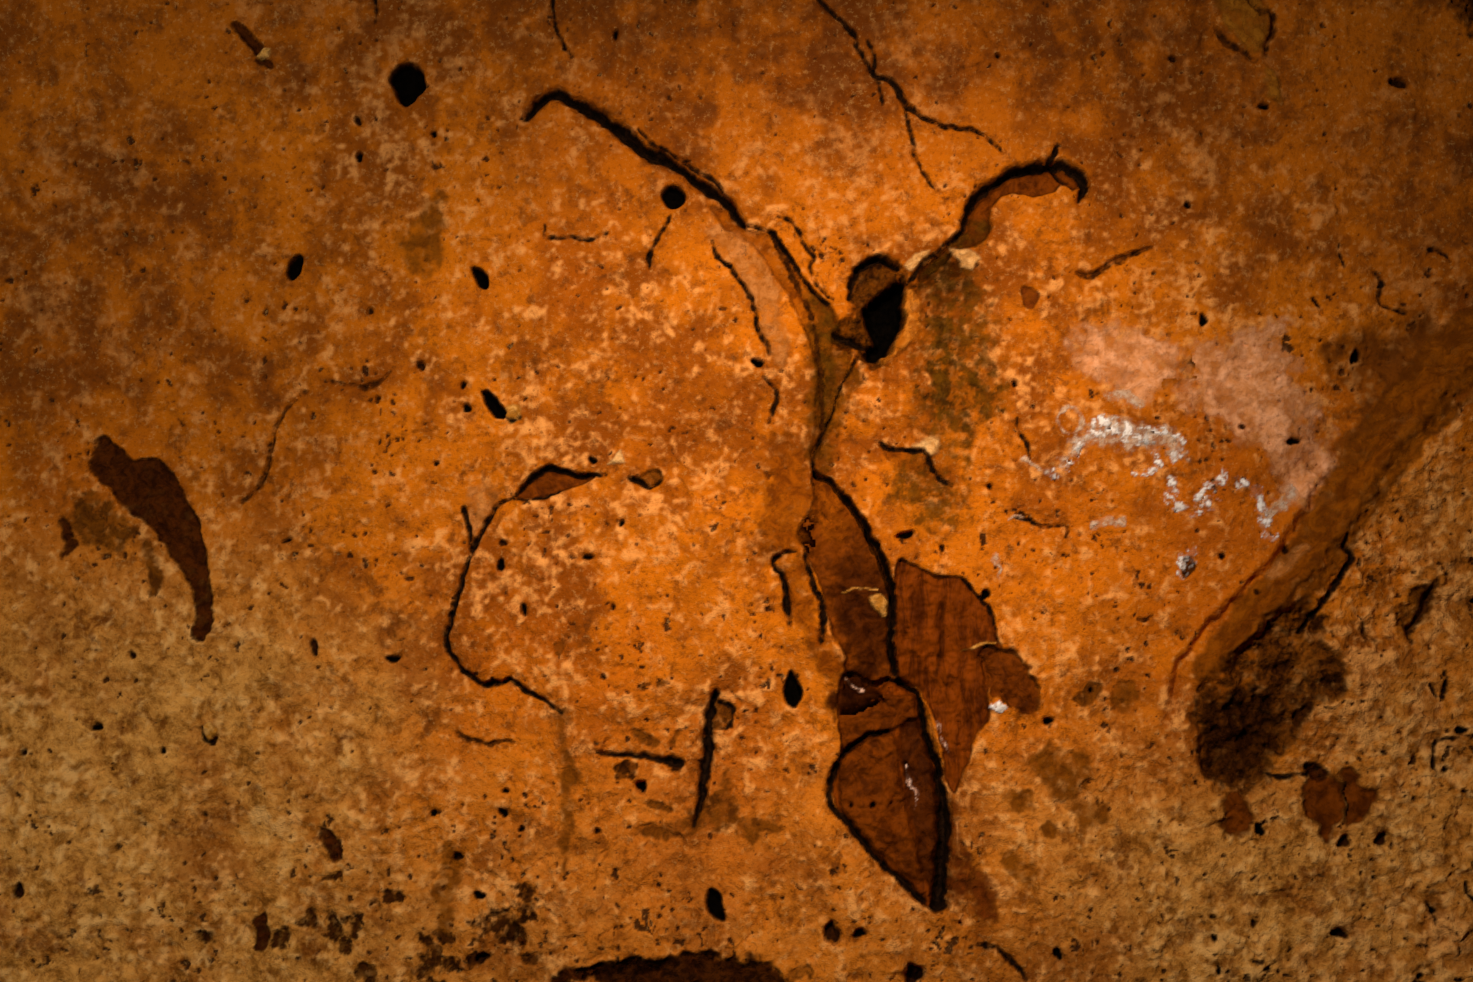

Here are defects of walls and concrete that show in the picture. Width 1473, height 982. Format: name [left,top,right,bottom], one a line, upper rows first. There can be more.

crack [817,0,1089,245]
spalling [59,435,214,641]
crack [444,497,563,714]
crack [524,90,901,682]
spalling [709,208,1053,912]
crack [880,437,948,485]
crack [1016,417,1030,455]
leakage [1022,390,1295,537]
crack [596,691,781,849]
spalling [417,882,538,982]
spalling [551,950,813,982]
spalling [707,889,725,921]